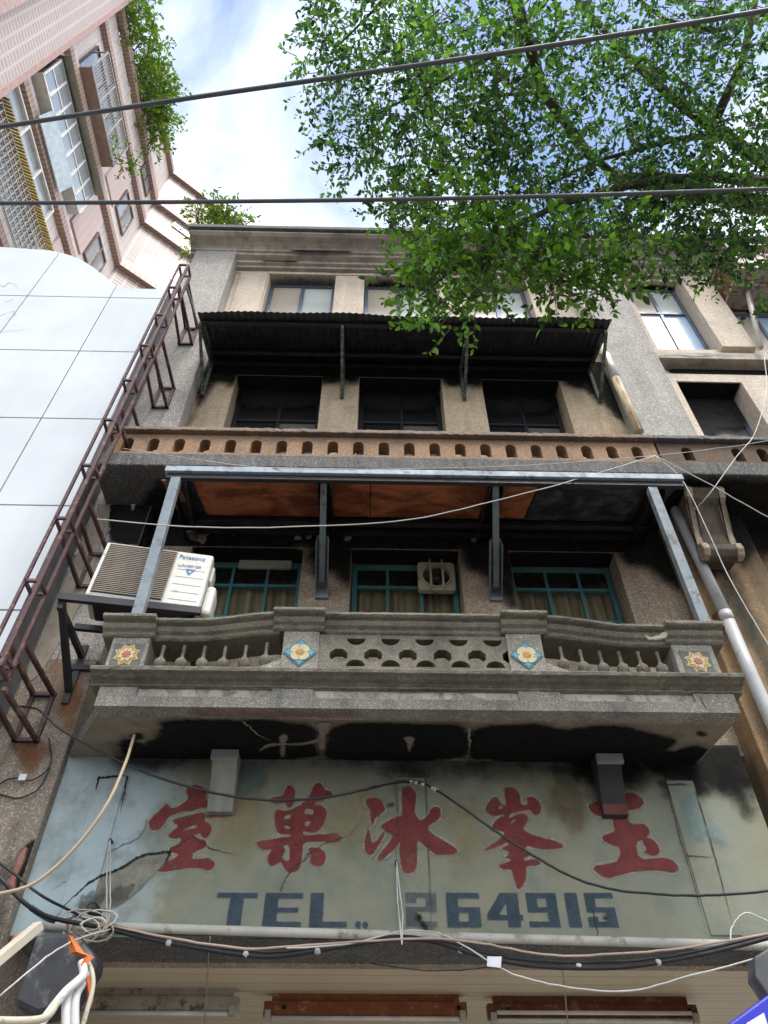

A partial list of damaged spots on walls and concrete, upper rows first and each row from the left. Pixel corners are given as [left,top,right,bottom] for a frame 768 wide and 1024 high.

crack [96,775,128,814]
water stain [238,739,320,794]
water stain [664,777,705,795]
crack [50,820,235,916]